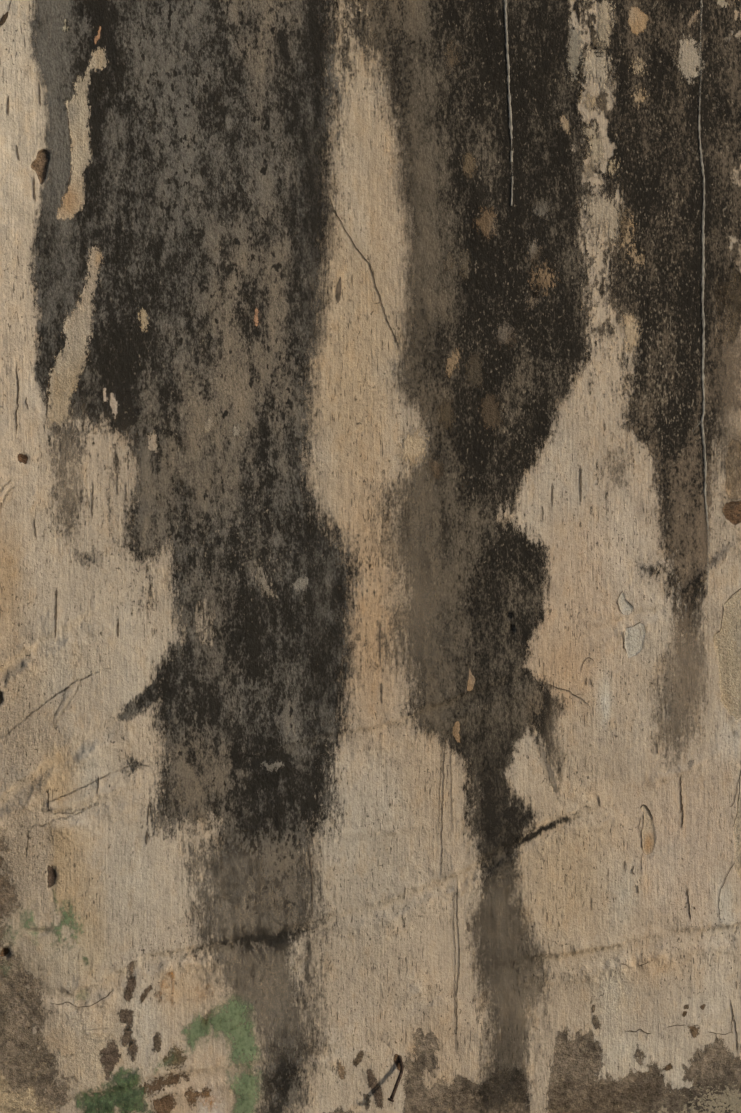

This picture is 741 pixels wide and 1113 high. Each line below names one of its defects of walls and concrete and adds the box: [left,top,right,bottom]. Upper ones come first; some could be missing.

water stain [573,0,741,654]
peeling [723,439,741,525]
water stain [30,0,618,1113]
peeling [713,589,741,719]
peeling [641,805,655,855]
spalling [0,833,77,1113]
water stain [12,899,83,949]
spalling [99,961,153,1082]
spalling [139,1032,212,1113]
spalling [323,1050,384,1113]
spalling [394,1028,532,1113]
spalling [545,1004,741,1113]